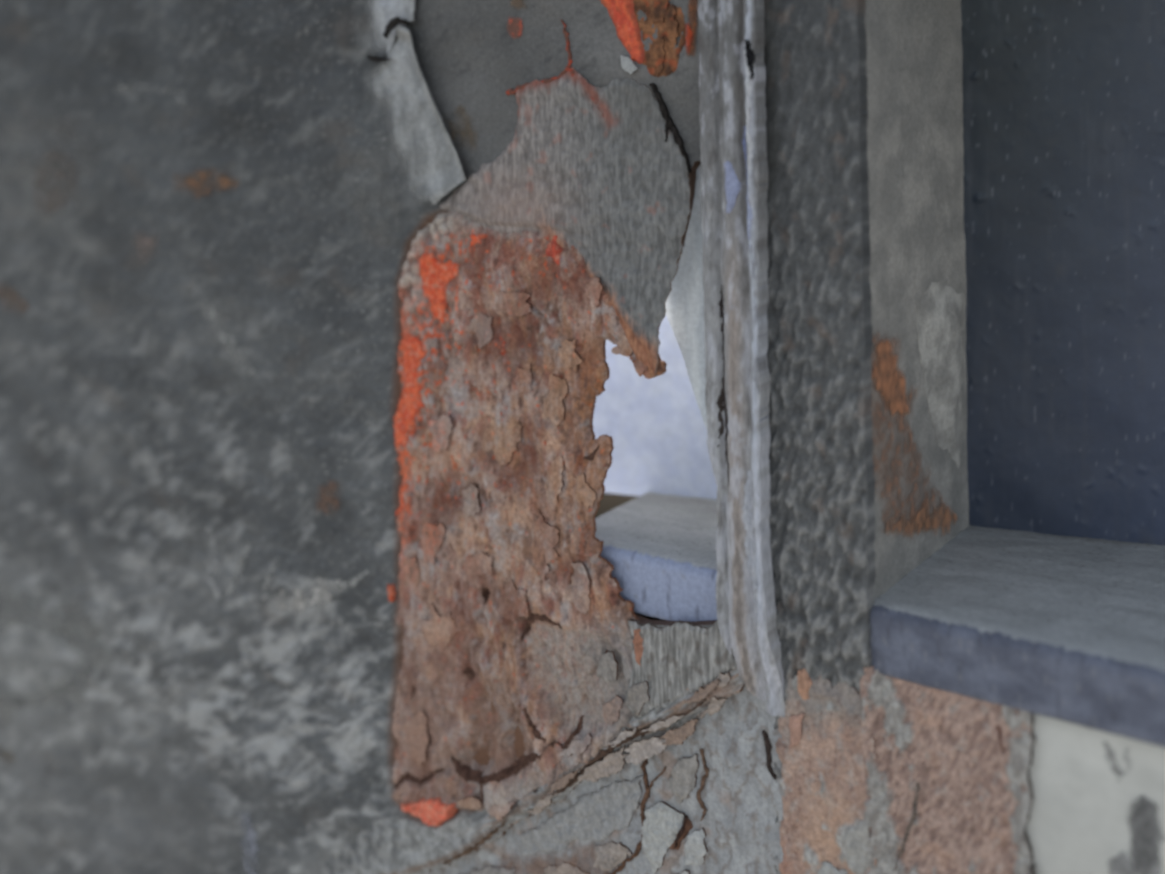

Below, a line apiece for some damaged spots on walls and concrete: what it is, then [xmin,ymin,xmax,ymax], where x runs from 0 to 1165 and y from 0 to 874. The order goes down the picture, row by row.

peeling [367,0,691,374]
crack [649,83,692,173]
corrosion [387,211,667,827]
peeling [315,618,745,874]
crack [607,759,667,874]
crack [696,749,709,821]